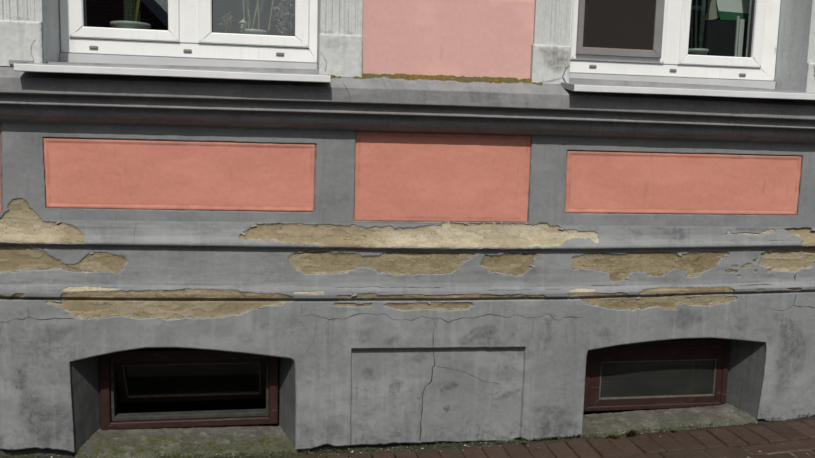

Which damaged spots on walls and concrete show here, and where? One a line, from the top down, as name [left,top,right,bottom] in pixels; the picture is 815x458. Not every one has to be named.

peeling [0,199,127,273]
peeling [239,221,729,282]
peeling [725,228,815,277]
peeling [0,286,324,320]
peeling [334,294,545,311]
peeling [567,287,737,310]
crack [301,307,578,438]